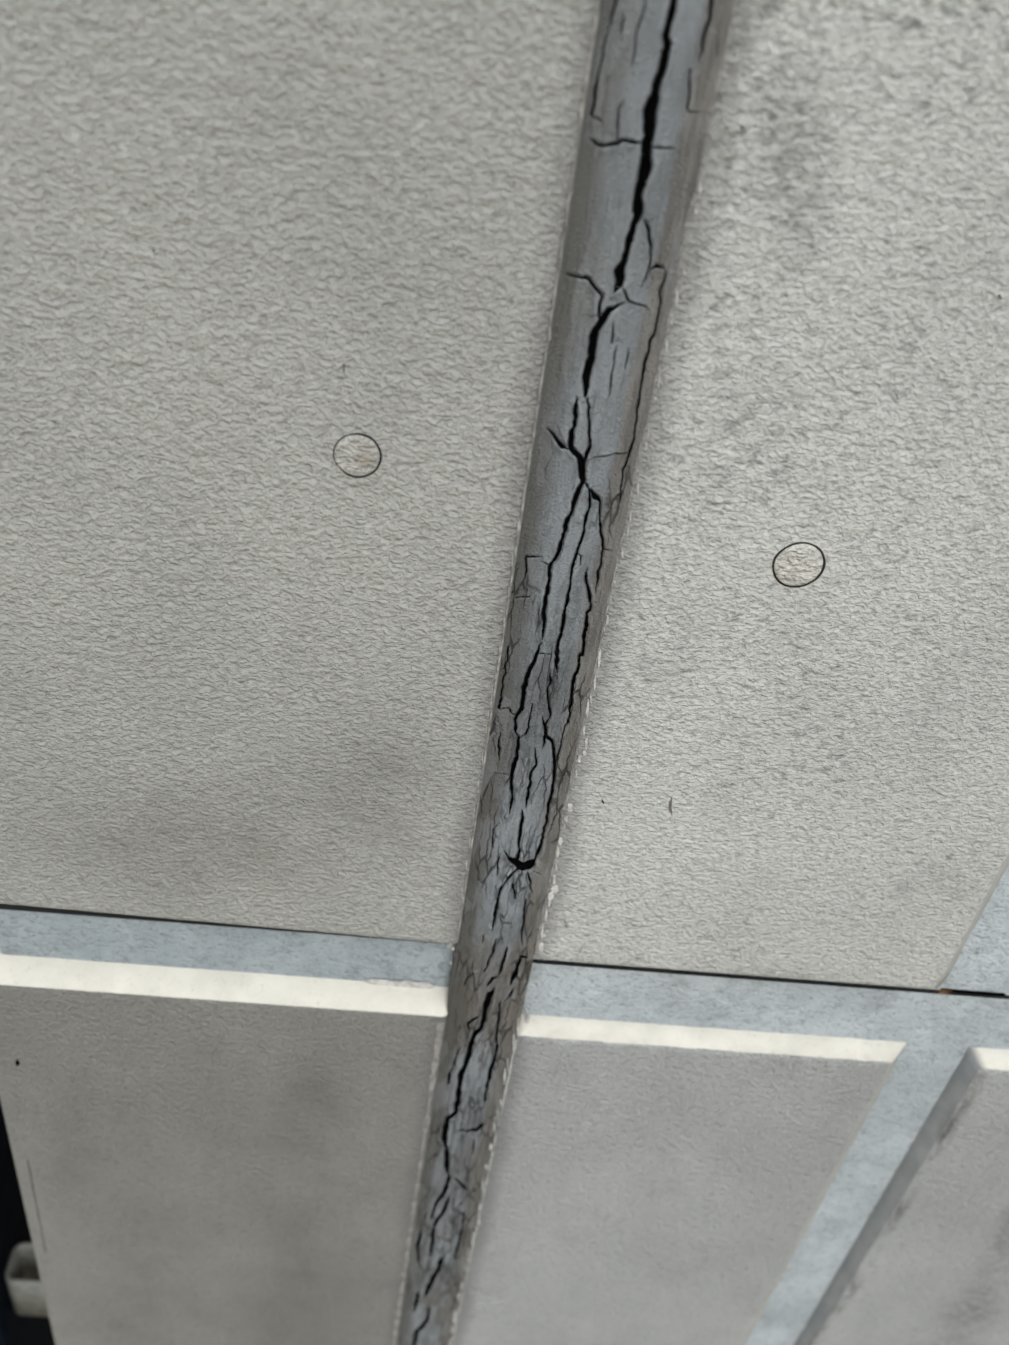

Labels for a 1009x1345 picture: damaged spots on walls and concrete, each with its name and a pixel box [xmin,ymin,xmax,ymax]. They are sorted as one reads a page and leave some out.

crack [412,0,712,1345]